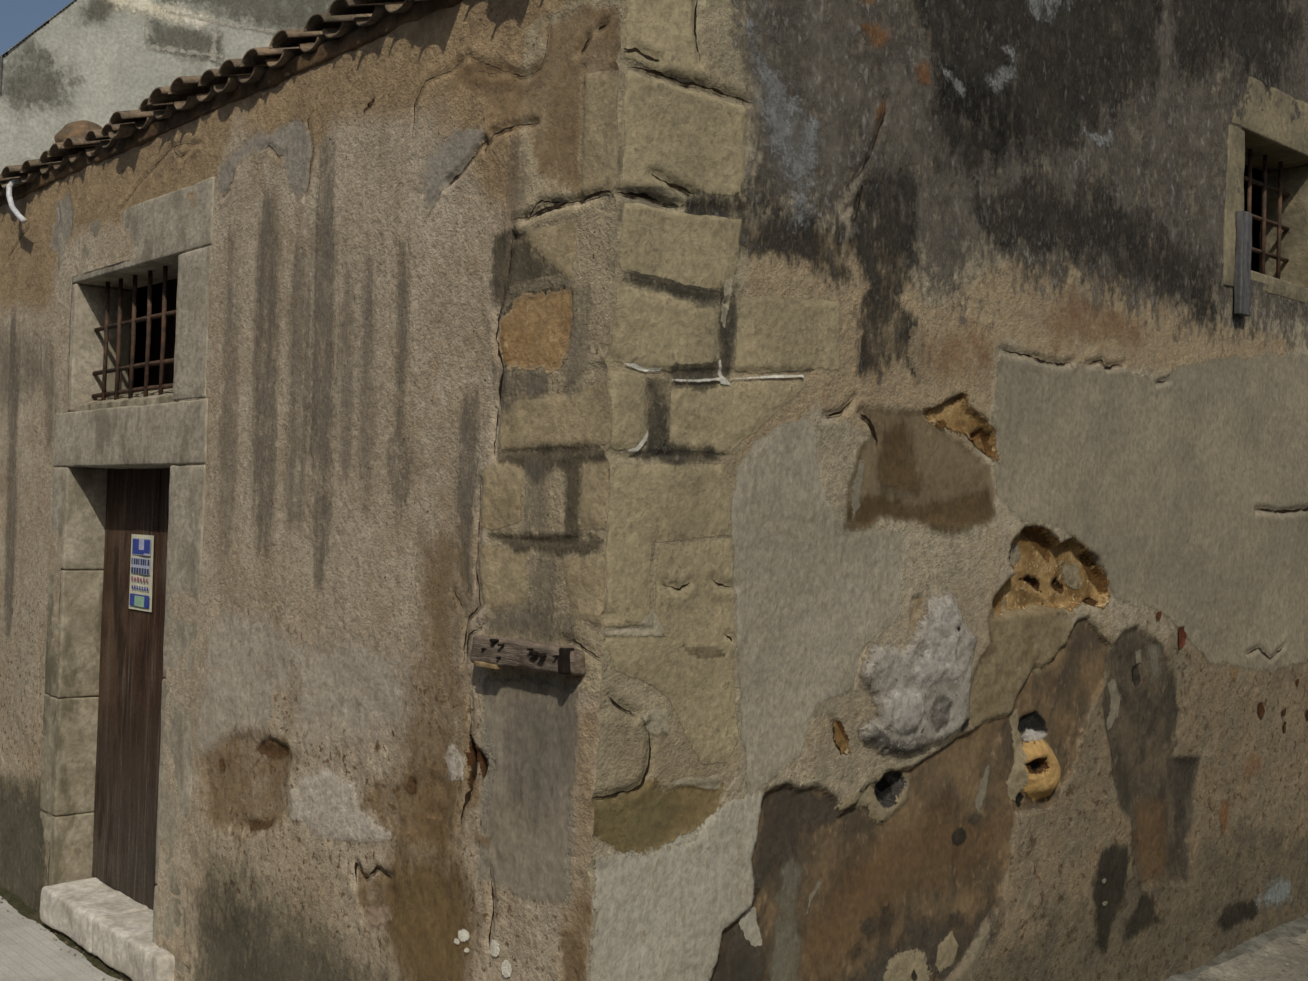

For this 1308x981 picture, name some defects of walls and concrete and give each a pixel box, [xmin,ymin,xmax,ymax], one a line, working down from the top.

crack [581,3,752,103]
damp [685,0,1308,383]
damp [5,315,18,636]
crack [453,484,485,662]
spalling [827,389,1001,533]
crack [1255,506,1308,514]
flaking render [195,611,488,846]
crack [460,697,477,826]
spalling [710,523,1200,981]
damp [0,781,47,910]
damp [195,878,387,981]
damp [386,851,474,981]